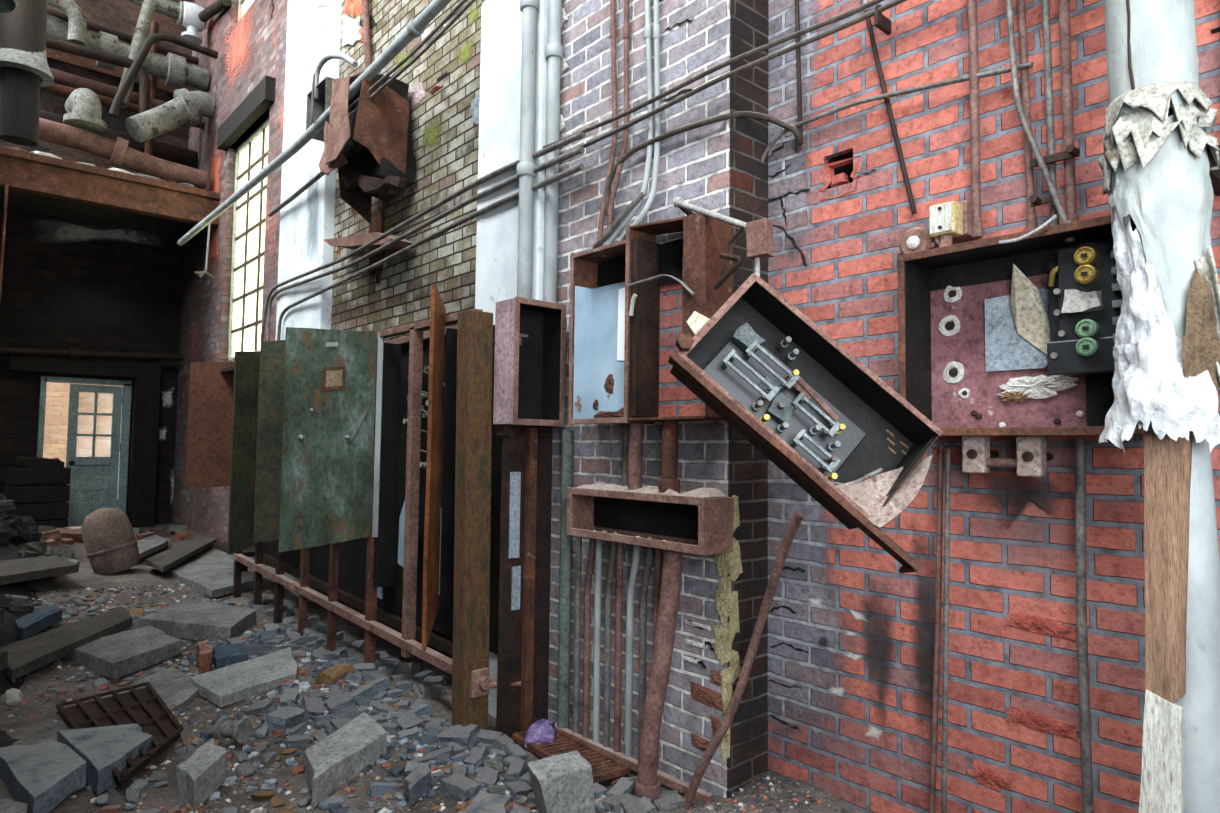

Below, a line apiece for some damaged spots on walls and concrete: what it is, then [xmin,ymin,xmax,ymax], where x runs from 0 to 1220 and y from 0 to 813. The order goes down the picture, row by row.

crack [659,0,693,31]
crack [663,89,694,101]
hole [818,151,877,200]
crack [768,142,810,267]